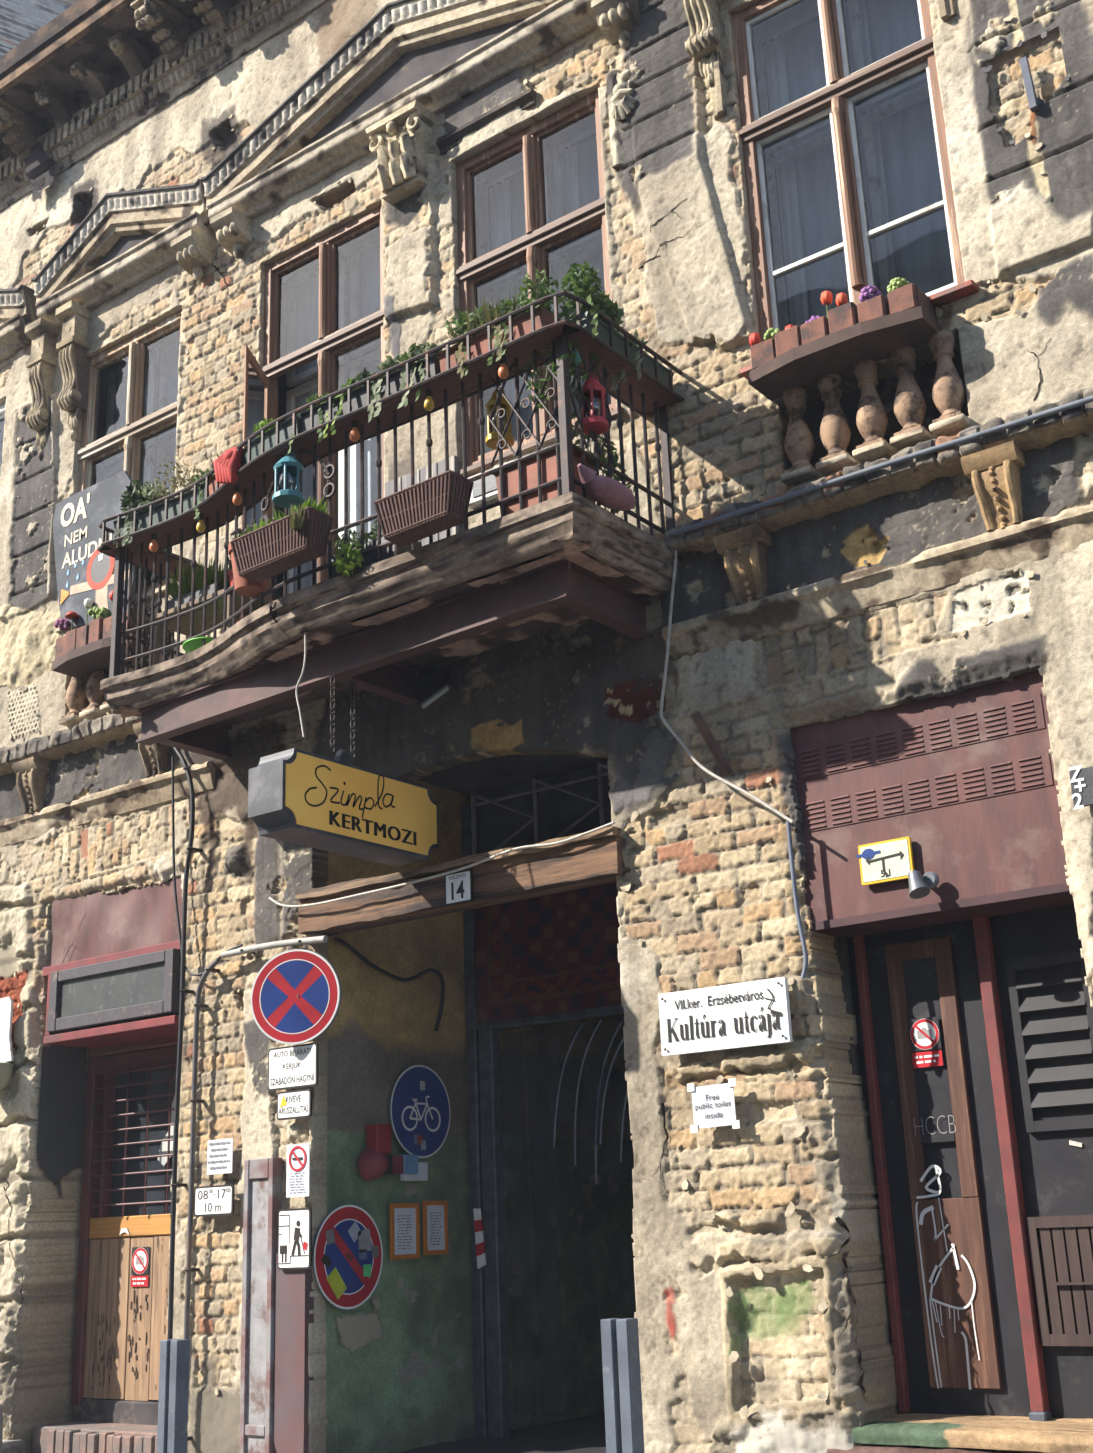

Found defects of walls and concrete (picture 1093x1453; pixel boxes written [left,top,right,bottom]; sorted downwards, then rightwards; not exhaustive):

spalling [983,0,1069,196]
peeling [823,523,890,566]
spalling [949,567,1034,637]
peeling [471,716,524,751]
spalling [603,674,812,993]
spalling [0,969,29,1052]
crack [824,1216,867,1416]